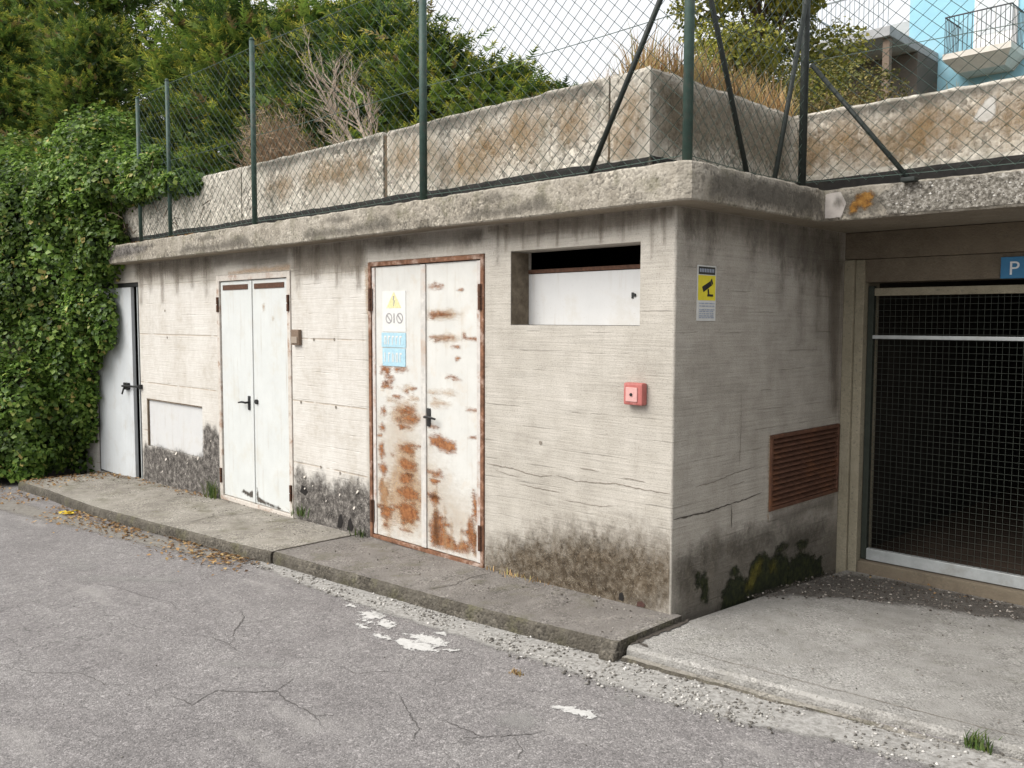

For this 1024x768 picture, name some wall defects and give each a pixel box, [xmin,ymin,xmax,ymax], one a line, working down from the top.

rust [378,366,477,554]
crack [487,463,669,507]
crack [674,394,760,527]
leakage [485,533,670,609]
leakage [682,540,756,621]
leakage [769,532,836,580]